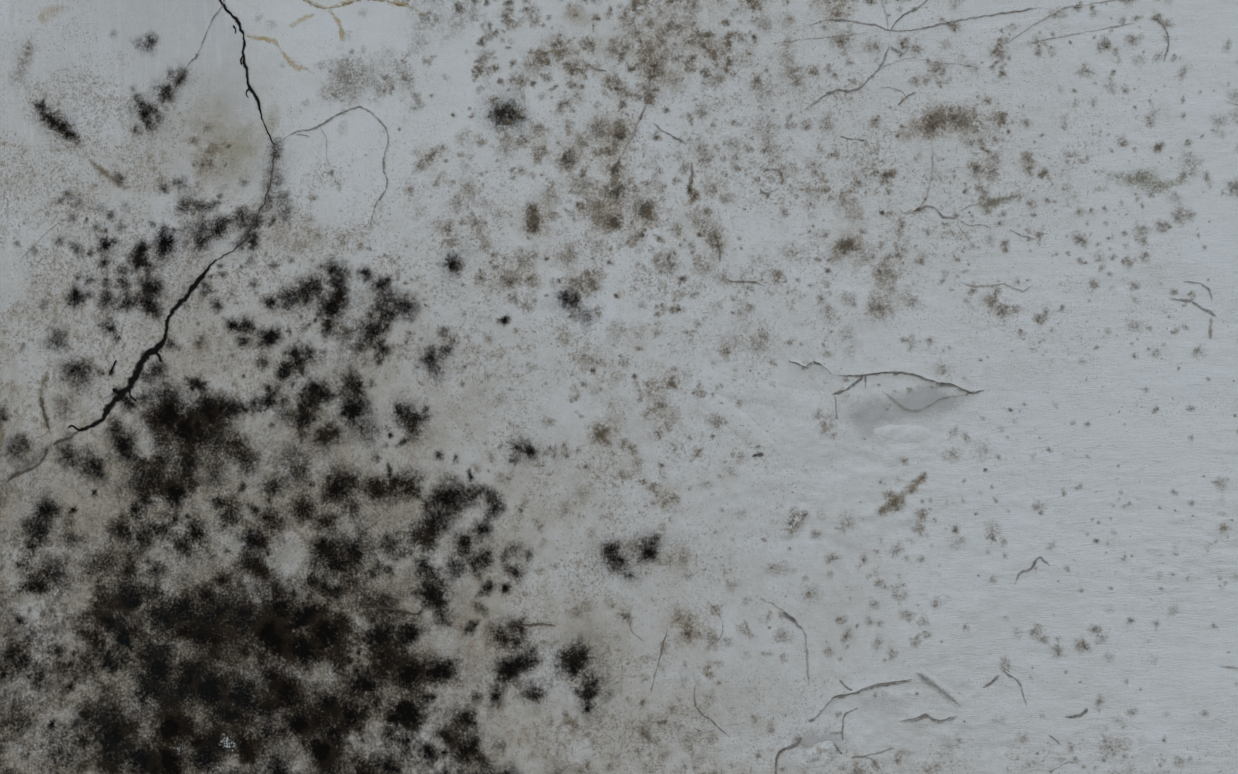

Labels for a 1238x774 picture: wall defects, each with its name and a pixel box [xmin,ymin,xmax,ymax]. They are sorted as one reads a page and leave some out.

damp [472,0,767,317]
damp [57,212,175,331]
crack [8,0,387,481]
damp [182,195,288,251]
damp [444,219,571,310]
damp [812,225,905,289]
damp [594,419,636,452]
peeling [790,355,984,428]
damp [0,265,578,774]
damp [556,646,611,734]
peeling [807,665,1030,722]
peeling [769,712,892,774]